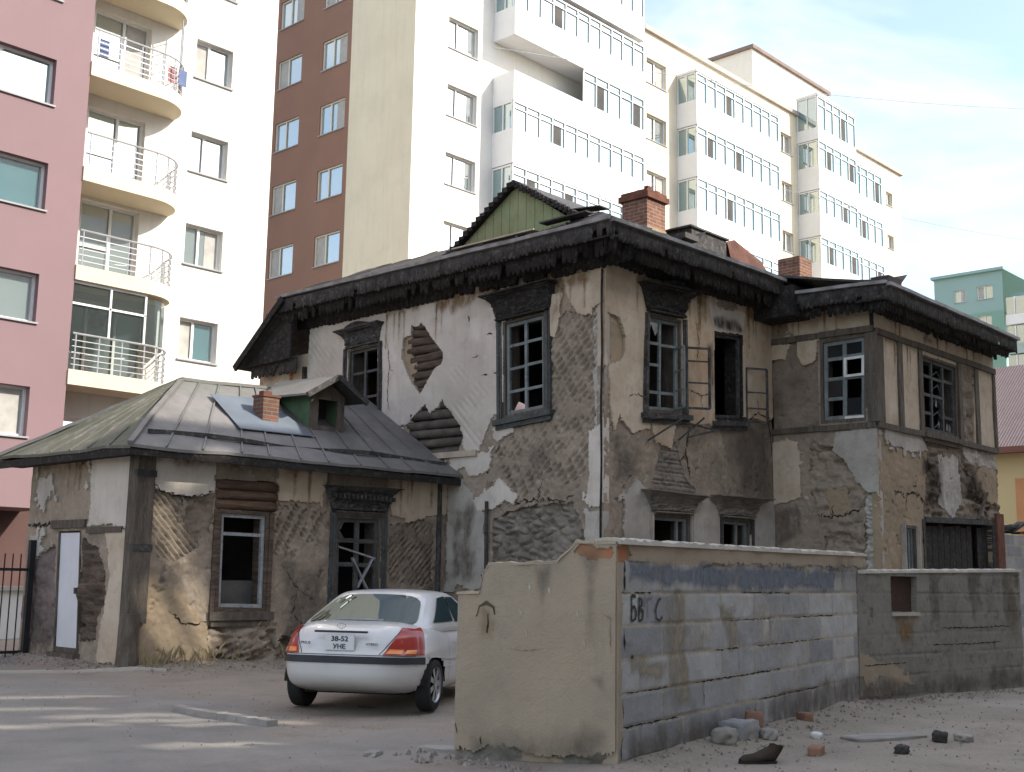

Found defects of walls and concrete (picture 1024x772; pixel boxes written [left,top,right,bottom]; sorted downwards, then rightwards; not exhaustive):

peeling [308,265,1000,592]
peeling [34,467,59,512]
crack [819,505,862,519]
peeling [76,456,130,664]
crack [169,611,206,626]